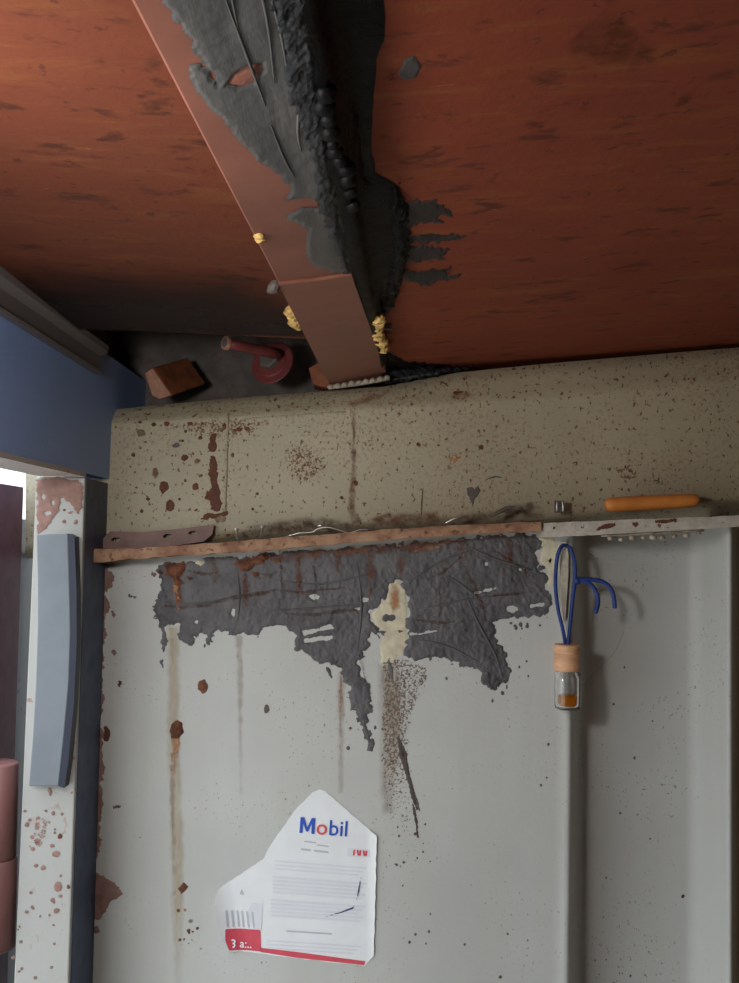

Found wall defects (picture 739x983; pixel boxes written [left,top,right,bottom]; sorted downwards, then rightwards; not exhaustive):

peeling [231,65,262,84]
rust [137,418,268,495]
peeling [35,477,84,534]
rust [130,468,181,519]
rust [158,560,205,601]
peeling [538,537,559,587]
peeling [101,566,117,714]
peeling [372,580,408,664]
rust [170,720,184,757]
rust [23,810,63,857]
rust [25,874,70,926]